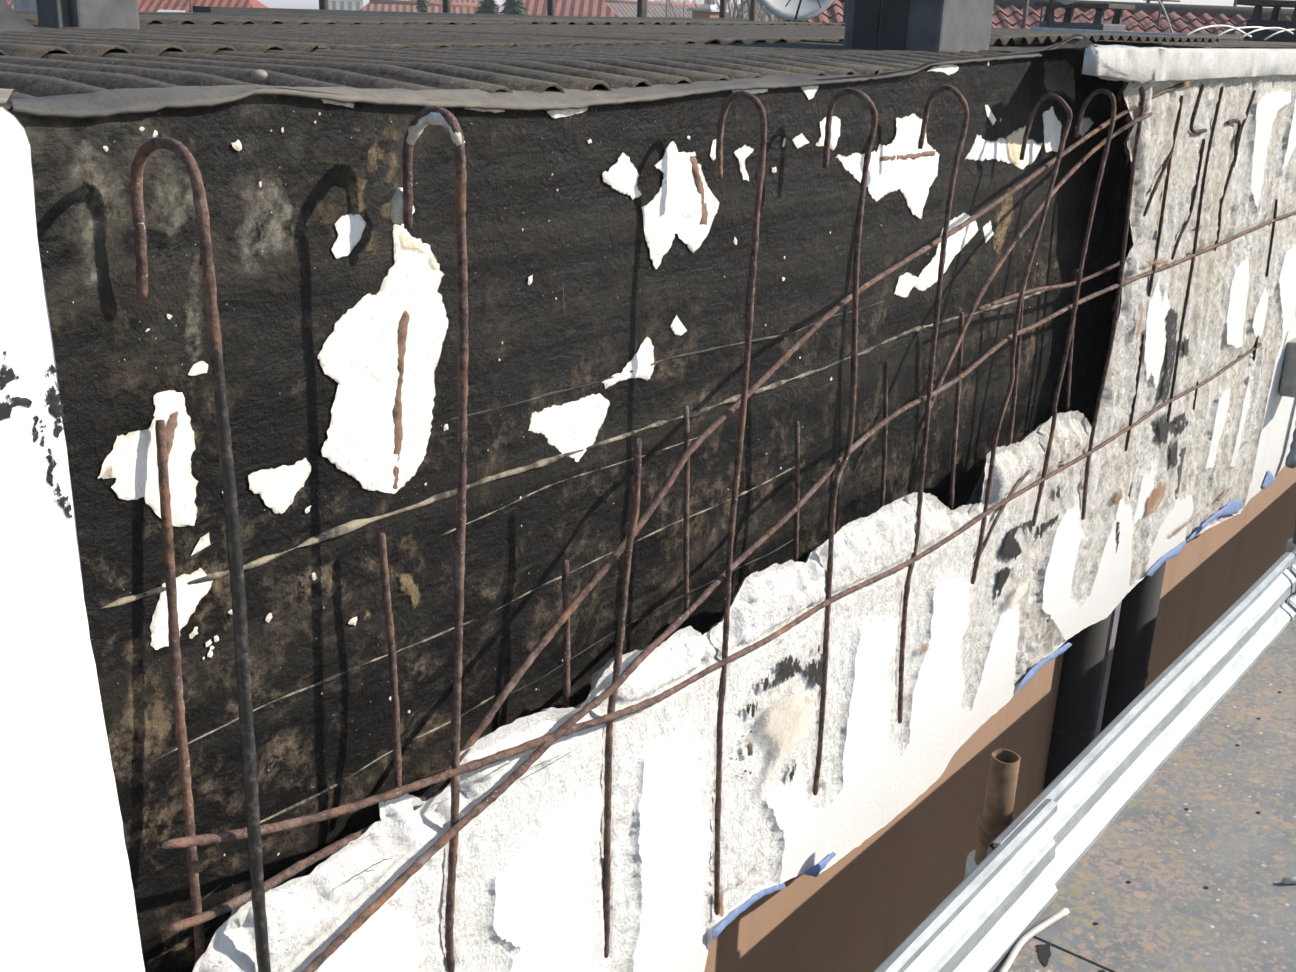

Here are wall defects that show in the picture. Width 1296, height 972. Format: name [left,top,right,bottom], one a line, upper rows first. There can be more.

spalling [927,64,959,75]
corrosion [1152,81,1190,99]
water stain [69,140,123,285]
water stain [241,180,301,271]
peeling [0,351,72,518]
spalling [188,361,208,376]
spalling [97,390,213,650]
water stain [400,575,419,605]
corrosion [130,105,726,972]
spalling [192,75,1296,972]
corrosion [561,84,1296,958]
water stain [758,686,818,804]